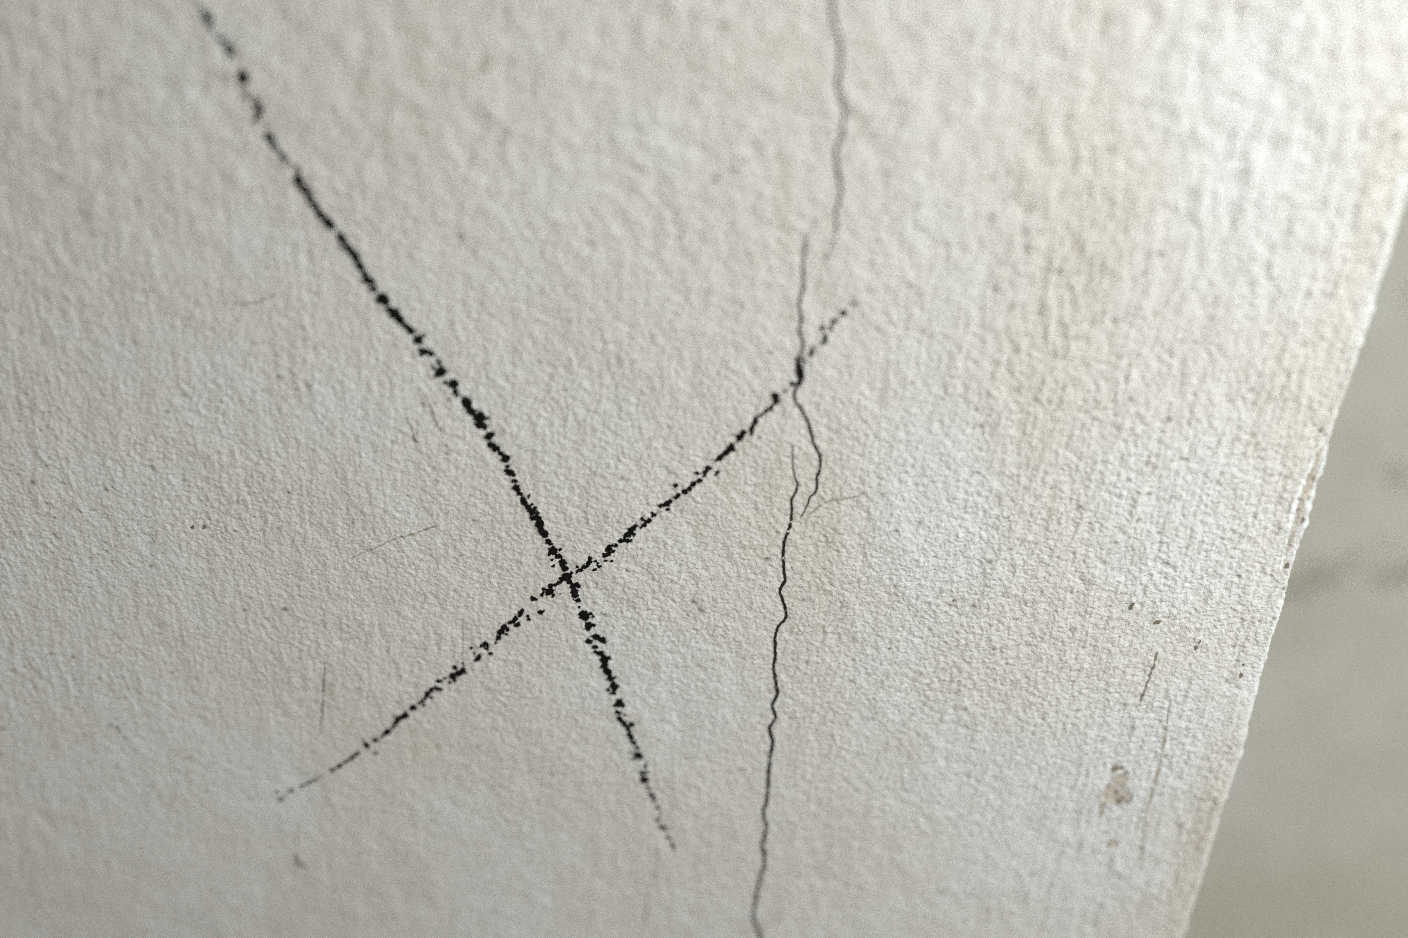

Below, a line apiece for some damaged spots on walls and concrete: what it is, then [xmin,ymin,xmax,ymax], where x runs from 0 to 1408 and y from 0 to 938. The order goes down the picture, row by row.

crack [752,0,847,938]